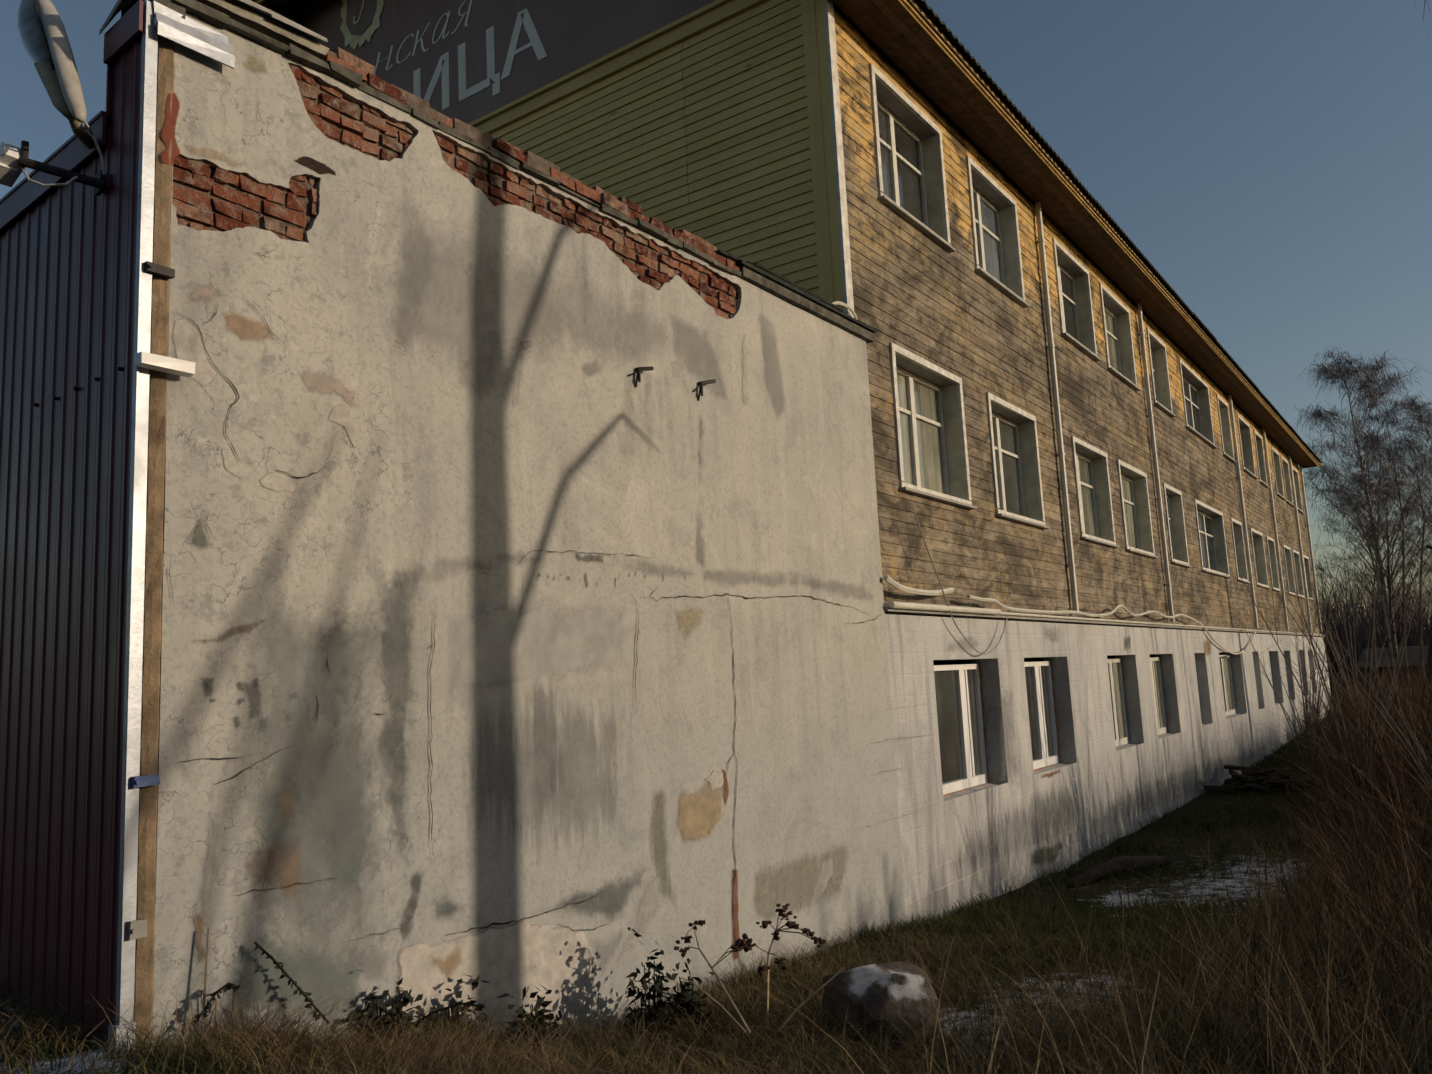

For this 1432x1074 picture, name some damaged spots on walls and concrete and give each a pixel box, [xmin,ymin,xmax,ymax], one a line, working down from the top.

flaking render [161,94,336,242]
flaking render [288,64,415,161]
flaking render [433,133,740,319]
crack [176,294,283,460]
crack [274,431,337,487]
water stain [235,627,366,930]
water stain [382,580,411,808]
crack [470,550,881,958]
water stain [239,940,359,1016]
water stain [401,875,421,933]
peeling [396,921,596,1044]
crack [445,892,606,1007]